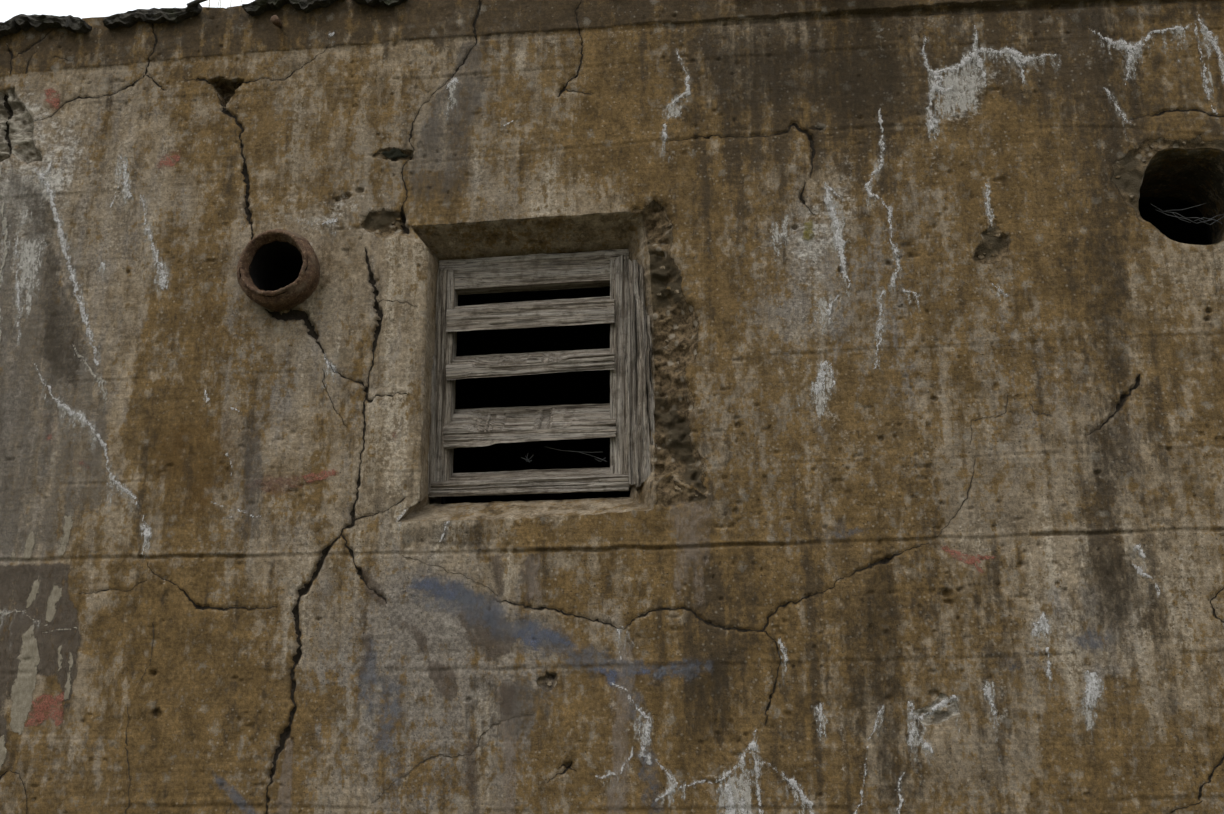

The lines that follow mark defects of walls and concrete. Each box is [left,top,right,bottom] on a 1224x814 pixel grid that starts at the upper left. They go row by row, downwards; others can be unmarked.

spalling [0,87,42,164]
crack [400,0,481,234]
water stain [922,25,1059,147]
water stain [1089,15,1224,114]
water stain [0,162,107,400]
water stain [34,364,152,556]
crack [78,248,417,814]
spalling [633,200,707,509]
crack [402,395,1053,726]
crack [1085,374,1140,435]
water stain [597,683,763,814]
crack [1167,756,1224,814]